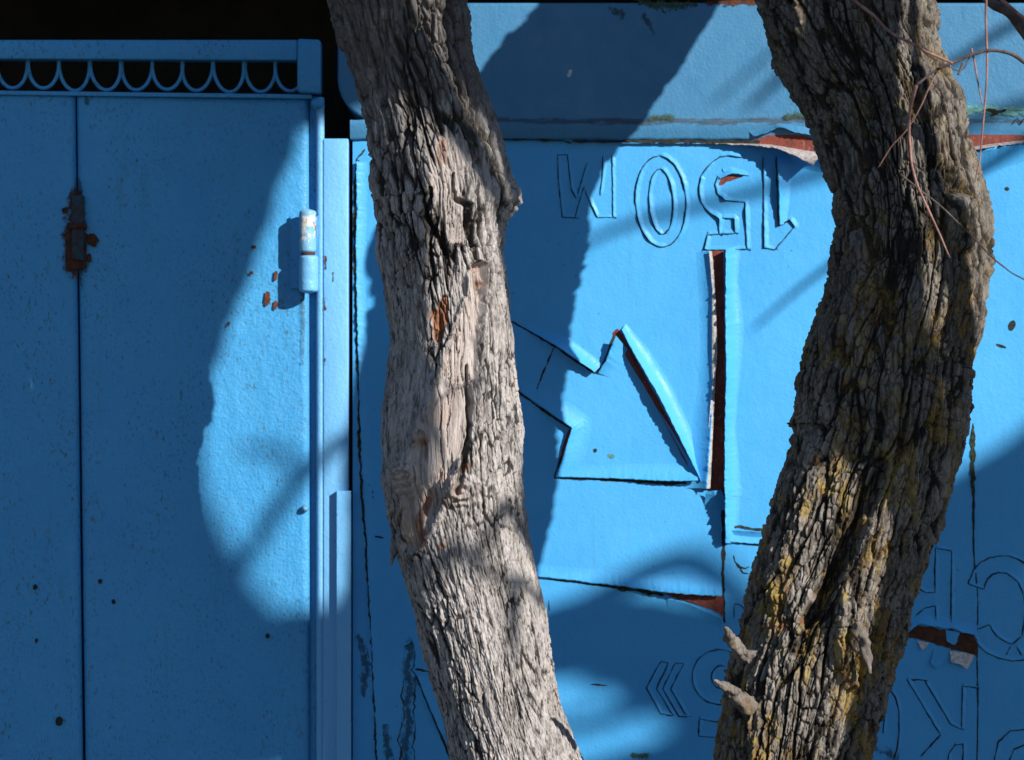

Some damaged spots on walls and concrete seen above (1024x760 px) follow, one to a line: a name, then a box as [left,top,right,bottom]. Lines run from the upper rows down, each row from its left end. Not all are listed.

rust [60,187,99,279]
rust [264,271,278,310]
peeling [908,613,978,669]